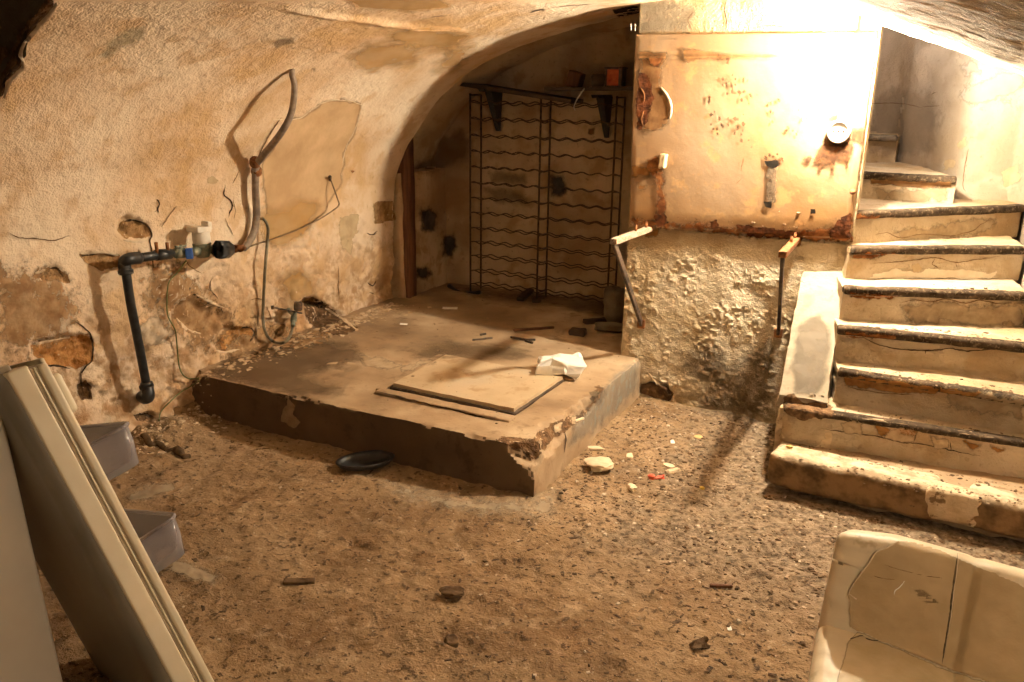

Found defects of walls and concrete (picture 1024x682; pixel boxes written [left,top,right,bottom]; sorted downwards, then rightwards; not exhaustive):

corrosion [683,49,779,62]
corrosion [636,51,673,131]
peeling [262,99,362,230]
corrosion [803,126,864,170]
spalling [117,219,152,243]
water stain [420,208,457,257]
corrosion [631,156,896,260]
crack [874,219,996,268]
water stain [0,260,81,361]
spalling [30,333,95,369]
spalling [496,385,605,459]
crack [827,429,980,456]